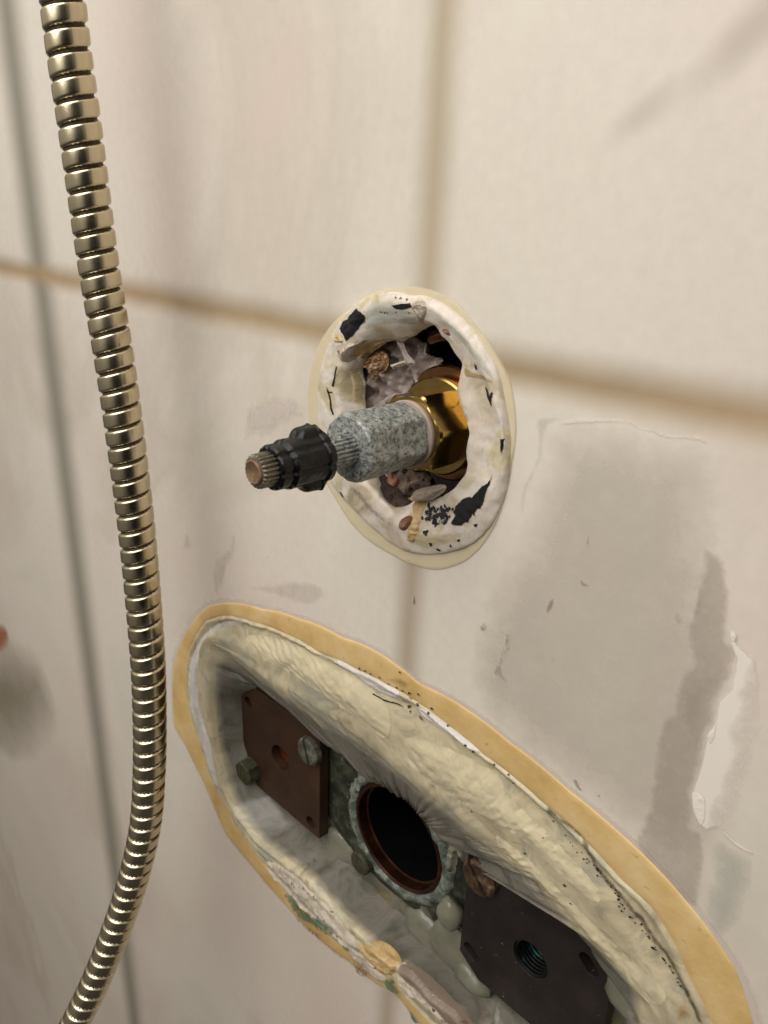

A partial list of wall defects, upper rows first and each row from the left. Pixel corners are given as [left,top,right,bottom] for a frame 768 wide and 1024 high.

damp [421,475,492,551]